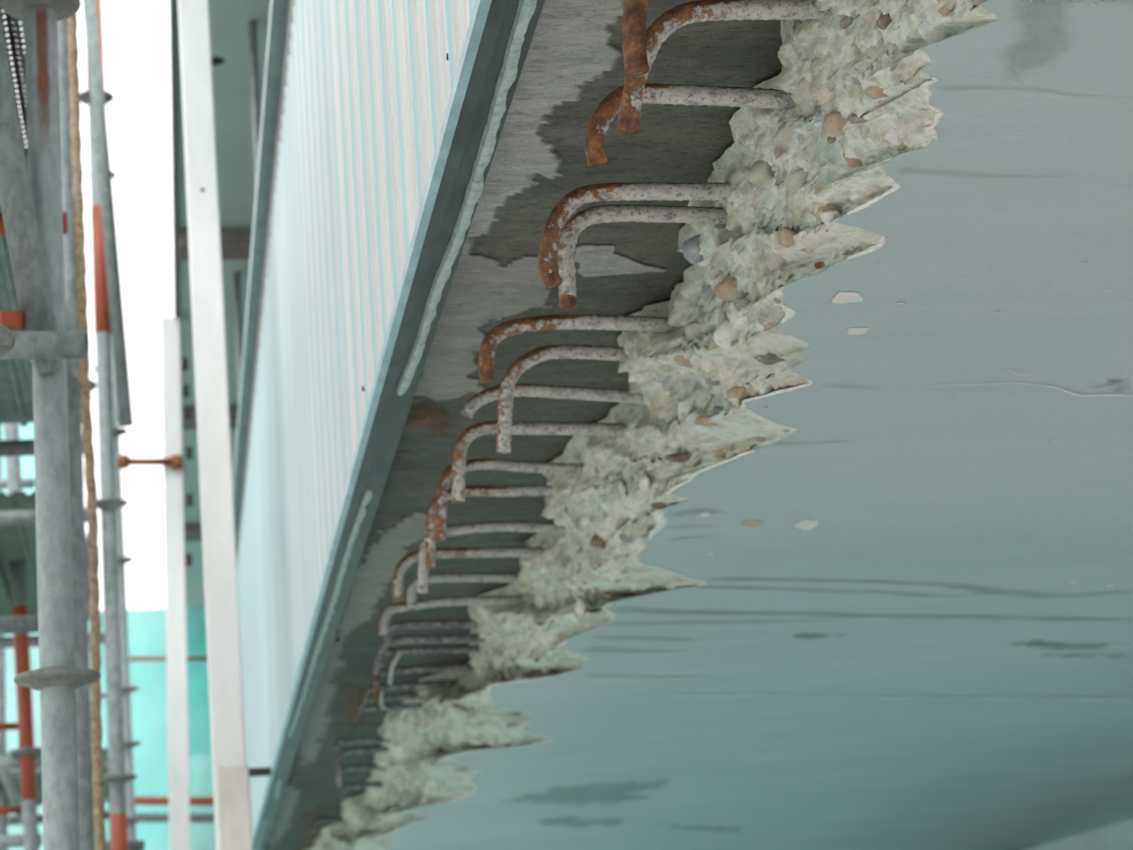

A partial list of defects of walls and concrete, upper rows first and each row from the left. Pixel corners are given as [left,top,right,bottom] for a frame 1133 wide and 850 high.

spalling [308,0,1000,850]
crack [940,372,1133,397]
peeling [266,512,426,850]